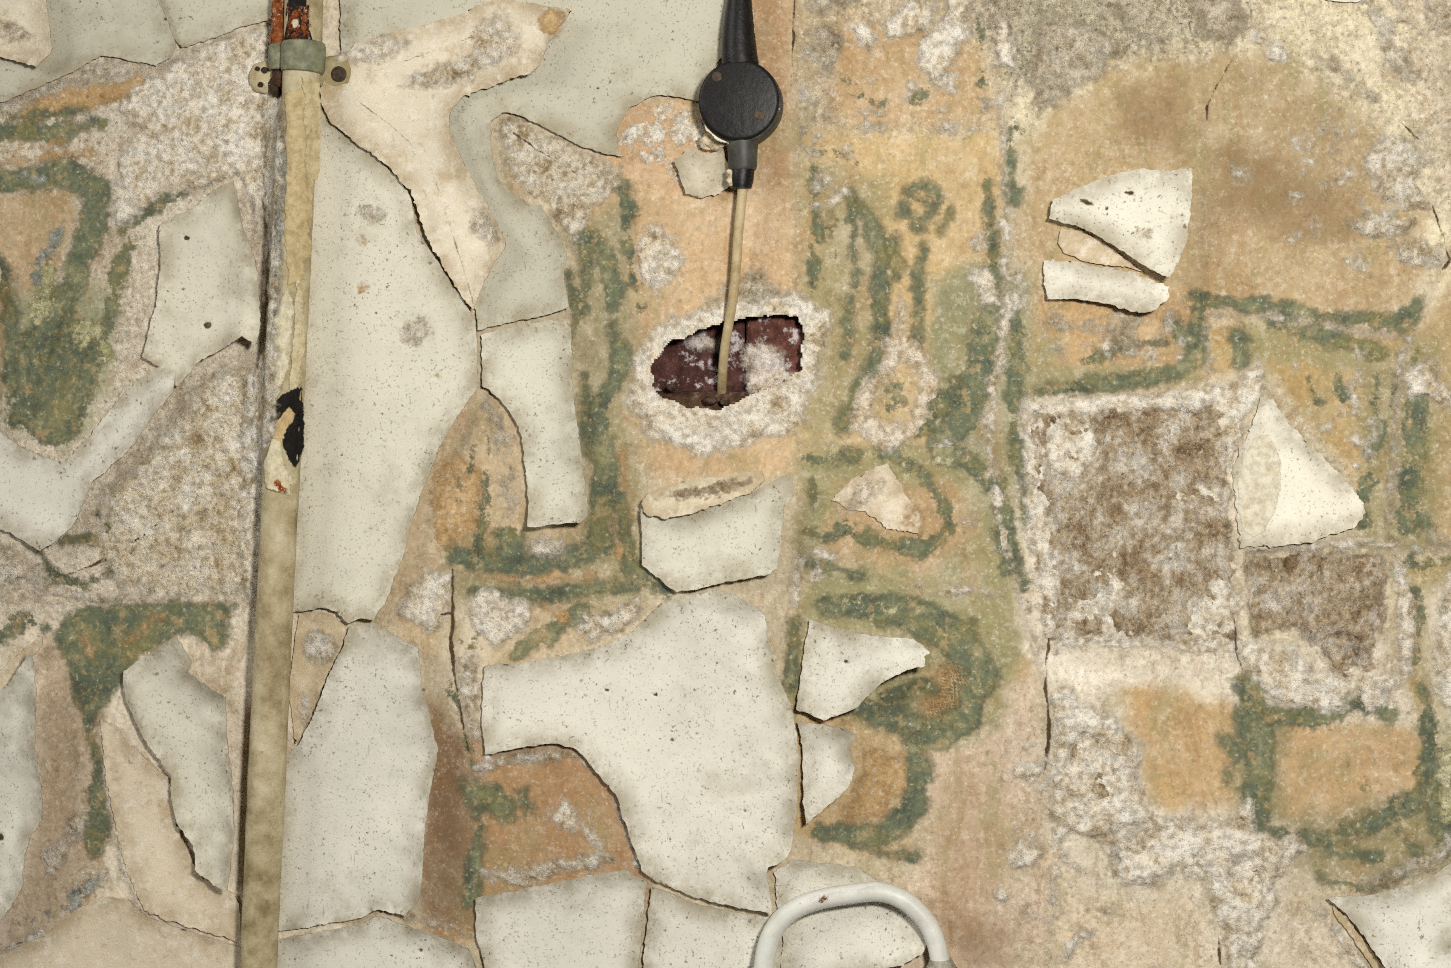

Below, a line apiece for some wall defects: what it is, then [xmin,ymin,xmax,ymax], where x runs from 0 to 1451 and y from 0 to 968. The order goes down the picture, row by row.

rust [268,0,314,44]
peeling [142,180,261,386]
flaking render [674,148,729,198]
peeling [1043,168,1193,313]
peeling [269,387,305,467]
spalling [651,315,805,410]
flaking render [832,463,921,533]
damp [396,0,1451,968]
spalling [1030,324,1395,677]
peeling [796,619,930,824]
peeling [0,636,241,968]
peeling [1328,841,1451,968]